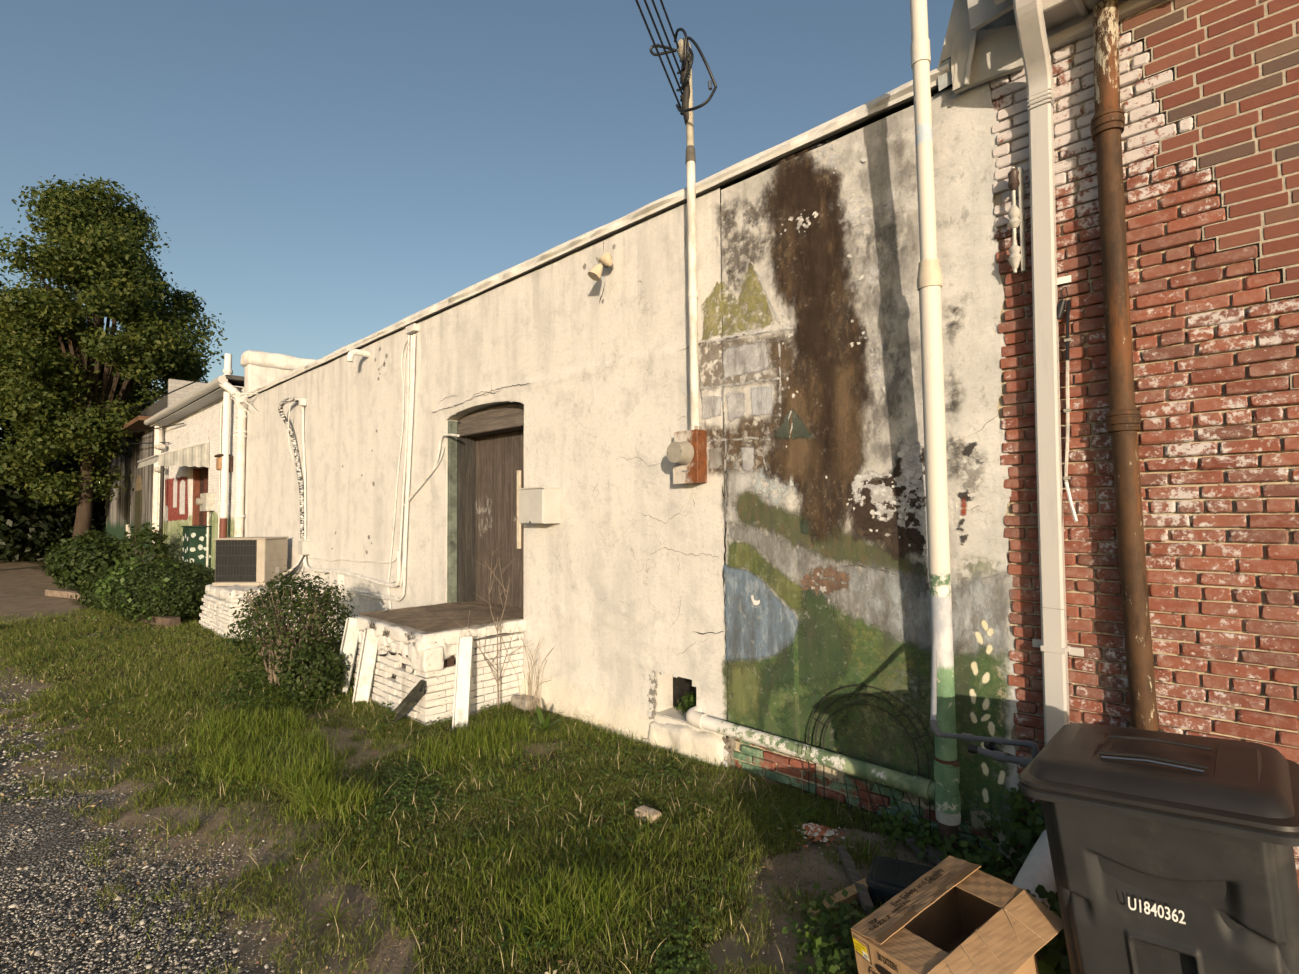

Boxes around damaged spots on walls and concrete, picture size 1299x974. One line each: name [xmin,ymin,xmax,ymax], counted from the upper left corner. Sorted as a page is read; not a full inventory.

leakage [718,150,915,542]
flaking render [647,671,677,719]
crack [625,455,729,764]
peeling [846,442,929,578]